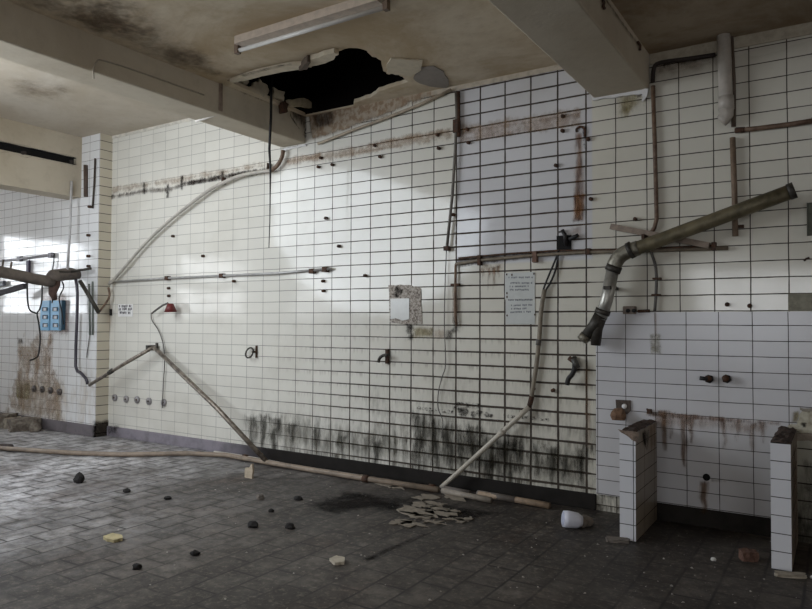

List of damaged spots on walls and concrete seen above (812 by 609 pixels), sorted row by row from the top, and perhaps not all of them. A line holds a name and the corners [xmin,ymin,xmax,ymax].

flaking render [230,48,339,114]
flaking render [386,58,449,88]
rust [574,126,586,219]
peeling [388,285,422,325]
leakage [415,417,521,477]
rust [653,411,699,464]
flaking render [789,408,812,441]